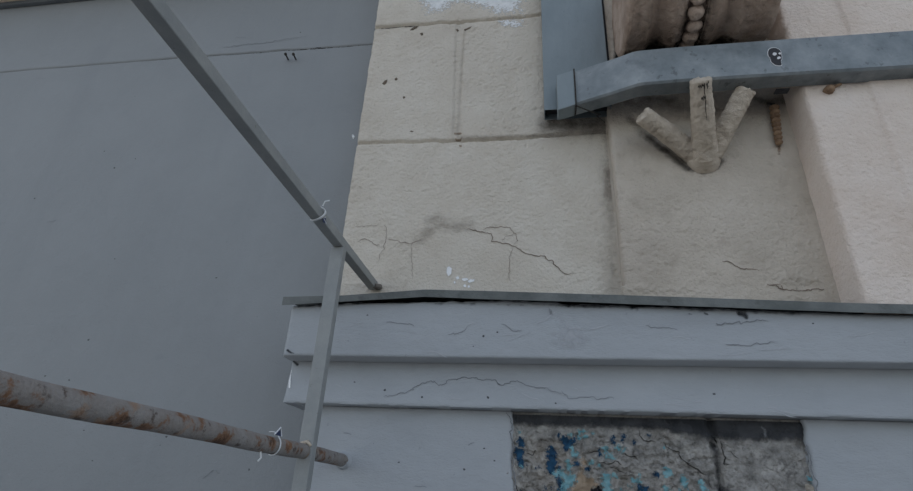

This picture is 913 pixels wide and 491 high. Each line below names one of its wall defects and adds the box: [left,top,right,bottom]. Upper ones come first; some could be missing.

crack [358,225,416,278]
crack [470,226,574,282]
crack [716,319,771,346]
crack [383,377,614,400]
spalling [505,402,818,491]